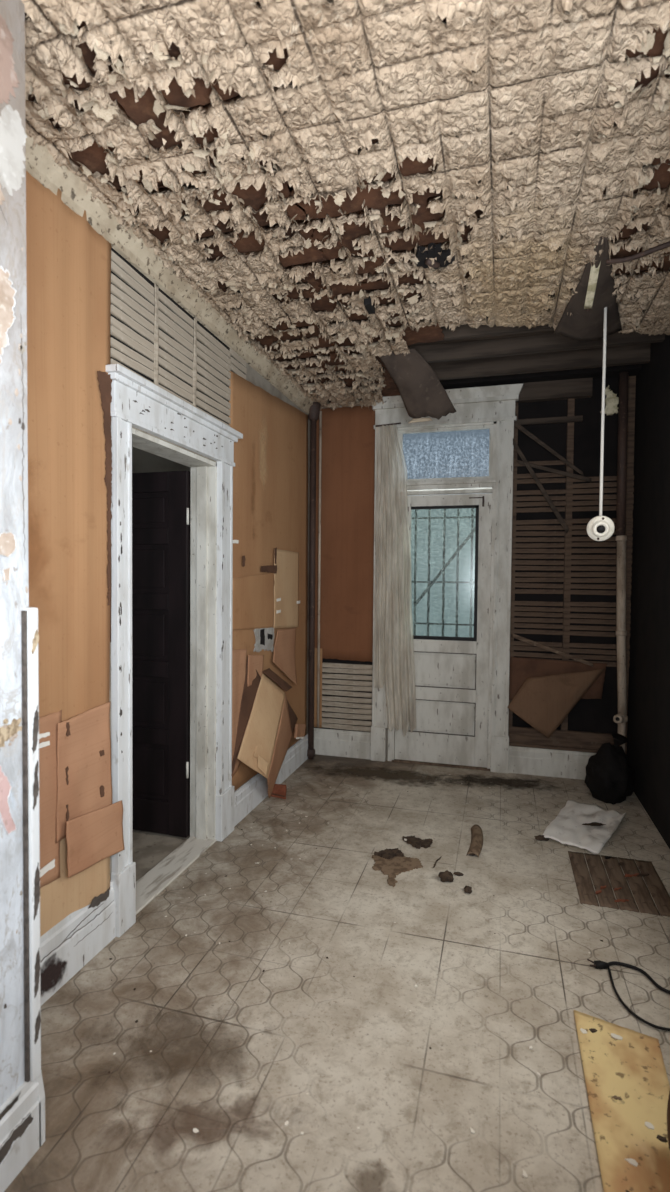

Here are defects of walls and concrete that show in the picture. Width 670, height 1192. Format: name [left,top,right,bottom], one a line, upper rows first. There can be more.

peeling [598,25,670,144]
peeling [0,15,467,425]
peeling [611,156,670,303]
flaking render [0,532,17,585]
flaking render [0,765,17,835]
spalling [0,705,39,810]
peeling [20,863,40,920]
spalling [0,1112,34,1166]